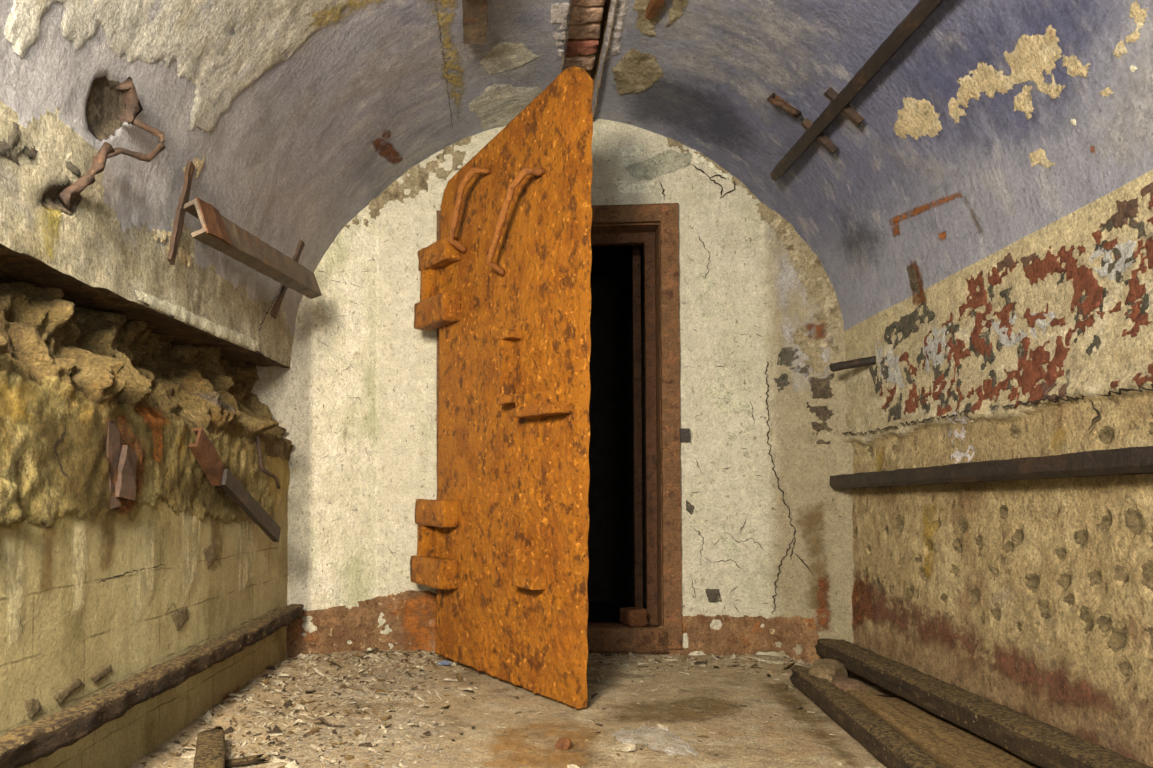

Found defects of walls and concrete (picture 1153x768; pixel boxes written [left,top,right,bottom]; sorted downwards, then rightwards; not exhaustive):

peeling [550,3,571,59]
peeling [1113,1,1148,73]
peeling [4,0,350,141]
peeling [893,25,1091,140]
peeling [0,122,38,165]
peeling [1029,148,1055,170]
spalling [153,229,192,269]
peeling [869,182,1153,424]
crack [54,426,70,480]
crack [688,325,815,615]
water stain [852,576,873,629]
spalling [54,663,112,705]